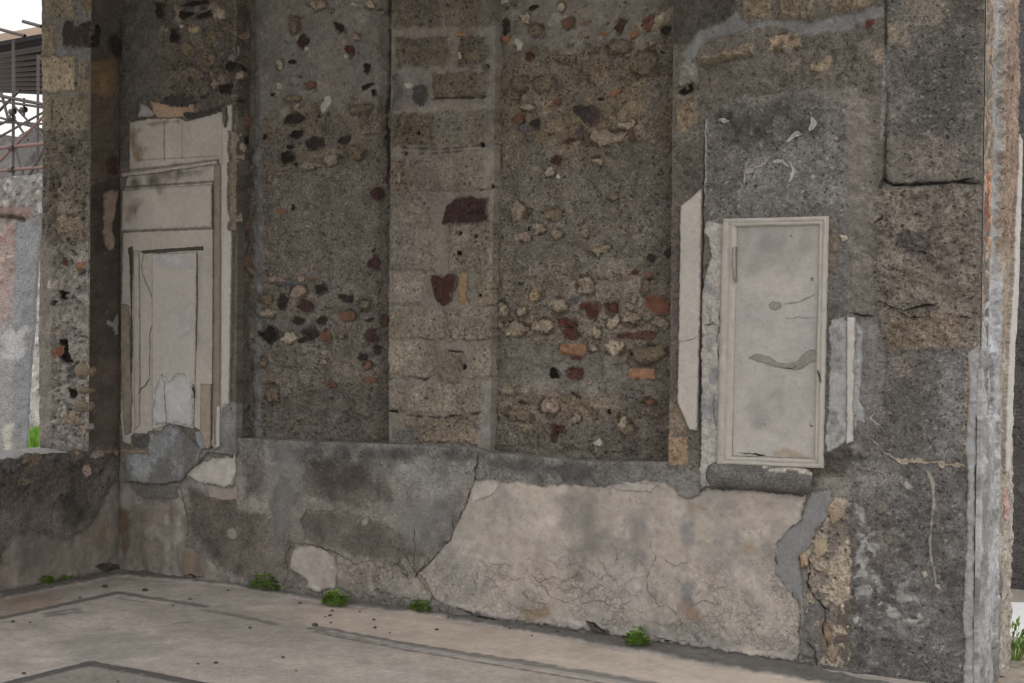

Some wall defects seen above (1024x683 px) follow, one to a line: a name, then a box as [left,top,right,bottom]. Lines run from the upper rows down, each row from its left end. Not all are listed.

crack [885,178,973,186]
crack [850,291,936,319]
peeling [0,481,230,592]
crack [283,543,360,586]
crack [398,452,479,579]
crack [458,541,728,645]
peeling [371,479,853,668]